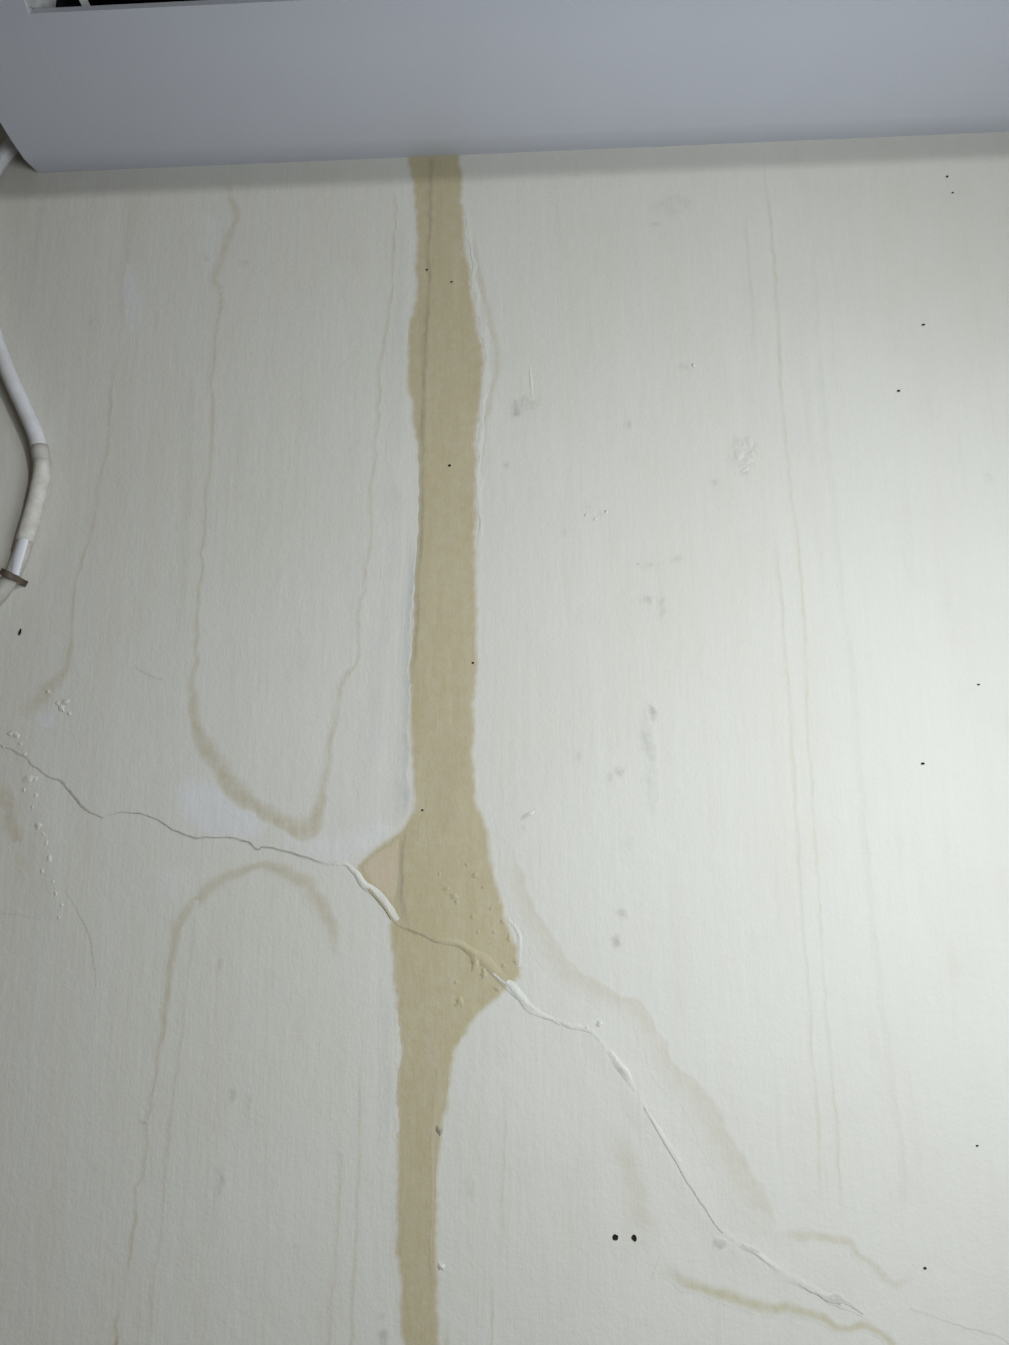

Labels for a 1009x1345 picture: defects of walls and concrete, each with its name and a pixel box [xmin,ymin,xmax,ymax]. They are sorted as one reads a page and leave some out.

crack [0,743,866,1318]
water stain [112,150,920,1345]